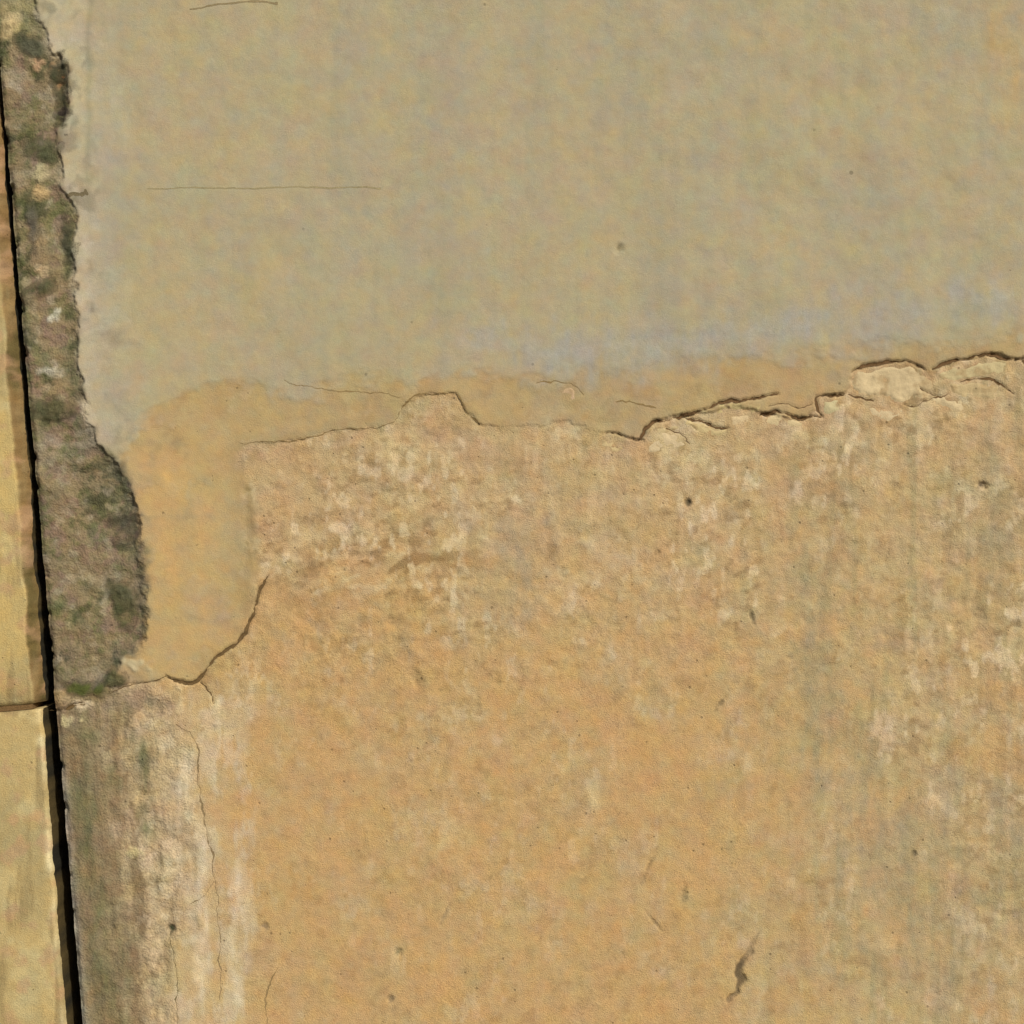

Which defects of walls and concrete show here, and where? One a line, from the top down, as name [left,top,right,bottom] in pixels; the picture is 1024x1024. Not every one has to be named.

peeling [852,362,1006,421]
peeling [649,402,802,452]
spalling [683,496,694,509]
crack [112,576,268,704]
spalling [725,929,761,1005]